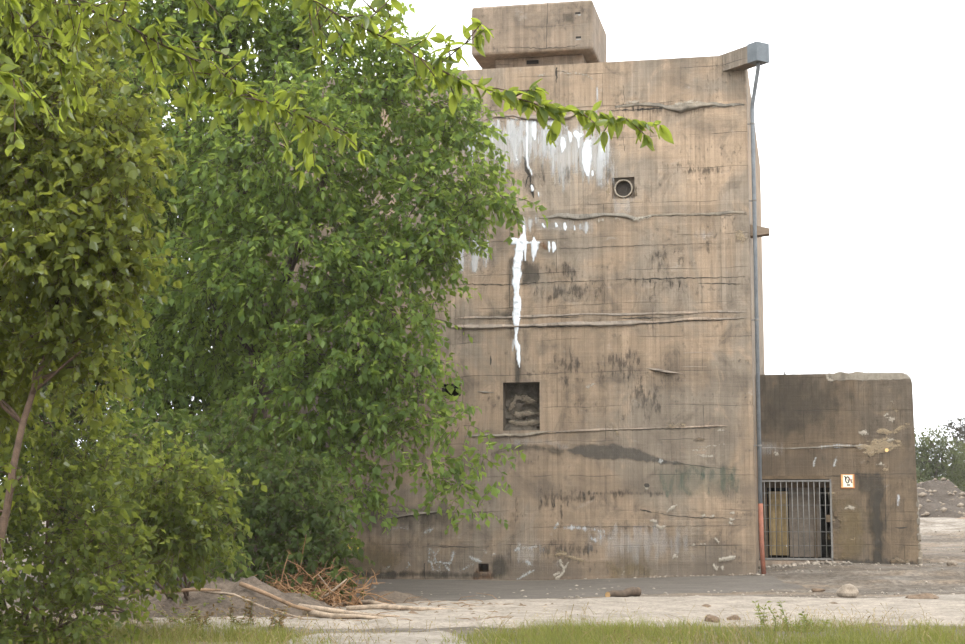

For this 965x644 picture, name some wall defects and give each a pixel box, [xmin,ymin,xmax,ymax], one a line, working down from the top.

water stain [467,120,610,179]
water stain [457,238,489,271]
water stain [511,221,588,383]
water stain [569,444,683,464]